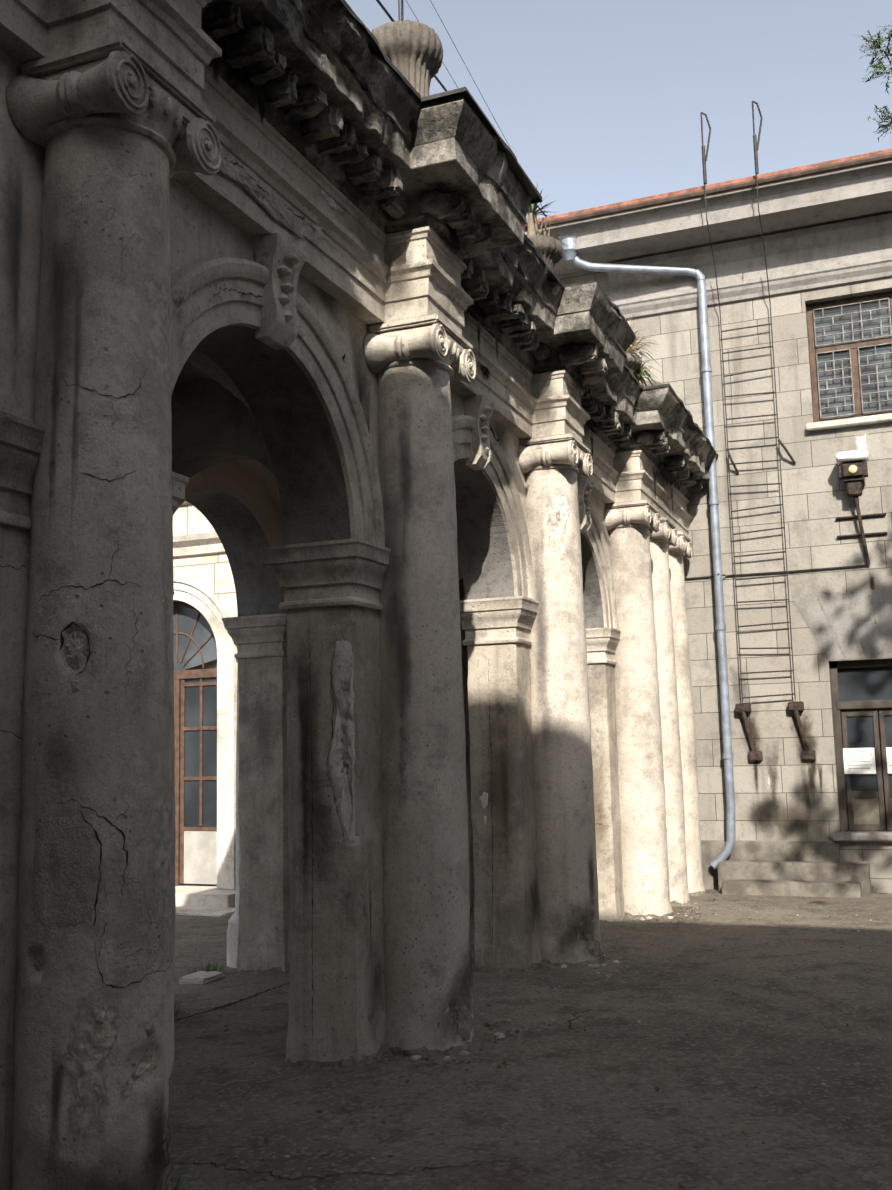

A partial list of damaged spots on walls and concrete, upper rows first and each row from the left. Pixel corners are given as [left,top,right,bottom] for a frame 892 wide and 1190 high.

crack [64,368,148,429]
crack [82,470,136,482]
crack [36,540,141,692]
spalling [59,621,91,694]
spalling [326,630,355,844]
rust [742,714,758,788]
water stain [768,769,776,798]
water stain [762,786,810,830]
rust [795,719,814,750]
rust [809,763,822,793]
crack [56,799,130,896]
crack [95,922,174,988]